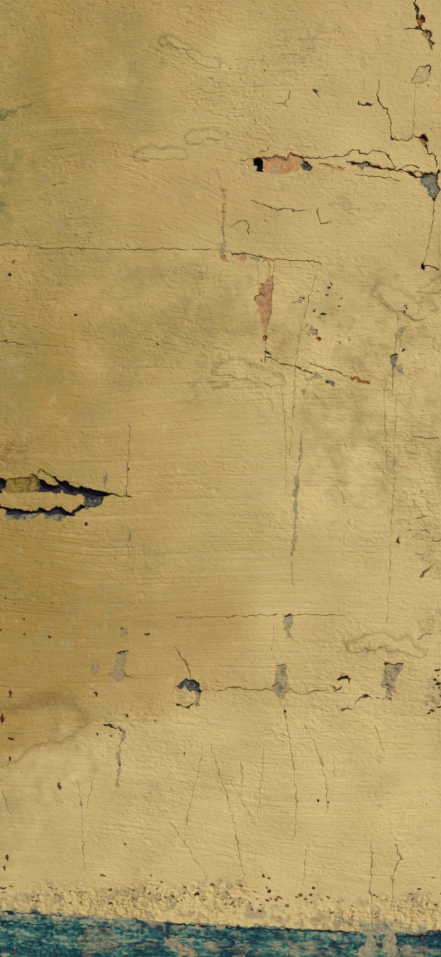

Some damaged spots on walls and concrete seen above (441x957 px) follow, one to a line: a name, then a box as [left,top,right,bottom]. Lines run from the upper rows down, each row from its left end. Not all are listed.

crack [406,0,434,49]
crack [358,80,413,141]
spalling [240,134,441,201]
crack [421,202,441,298]
spalling [0,421,132,521]
spalling [148,874,339,914]
peeling [165,938,198,957]
peeling [357,913,435,957]